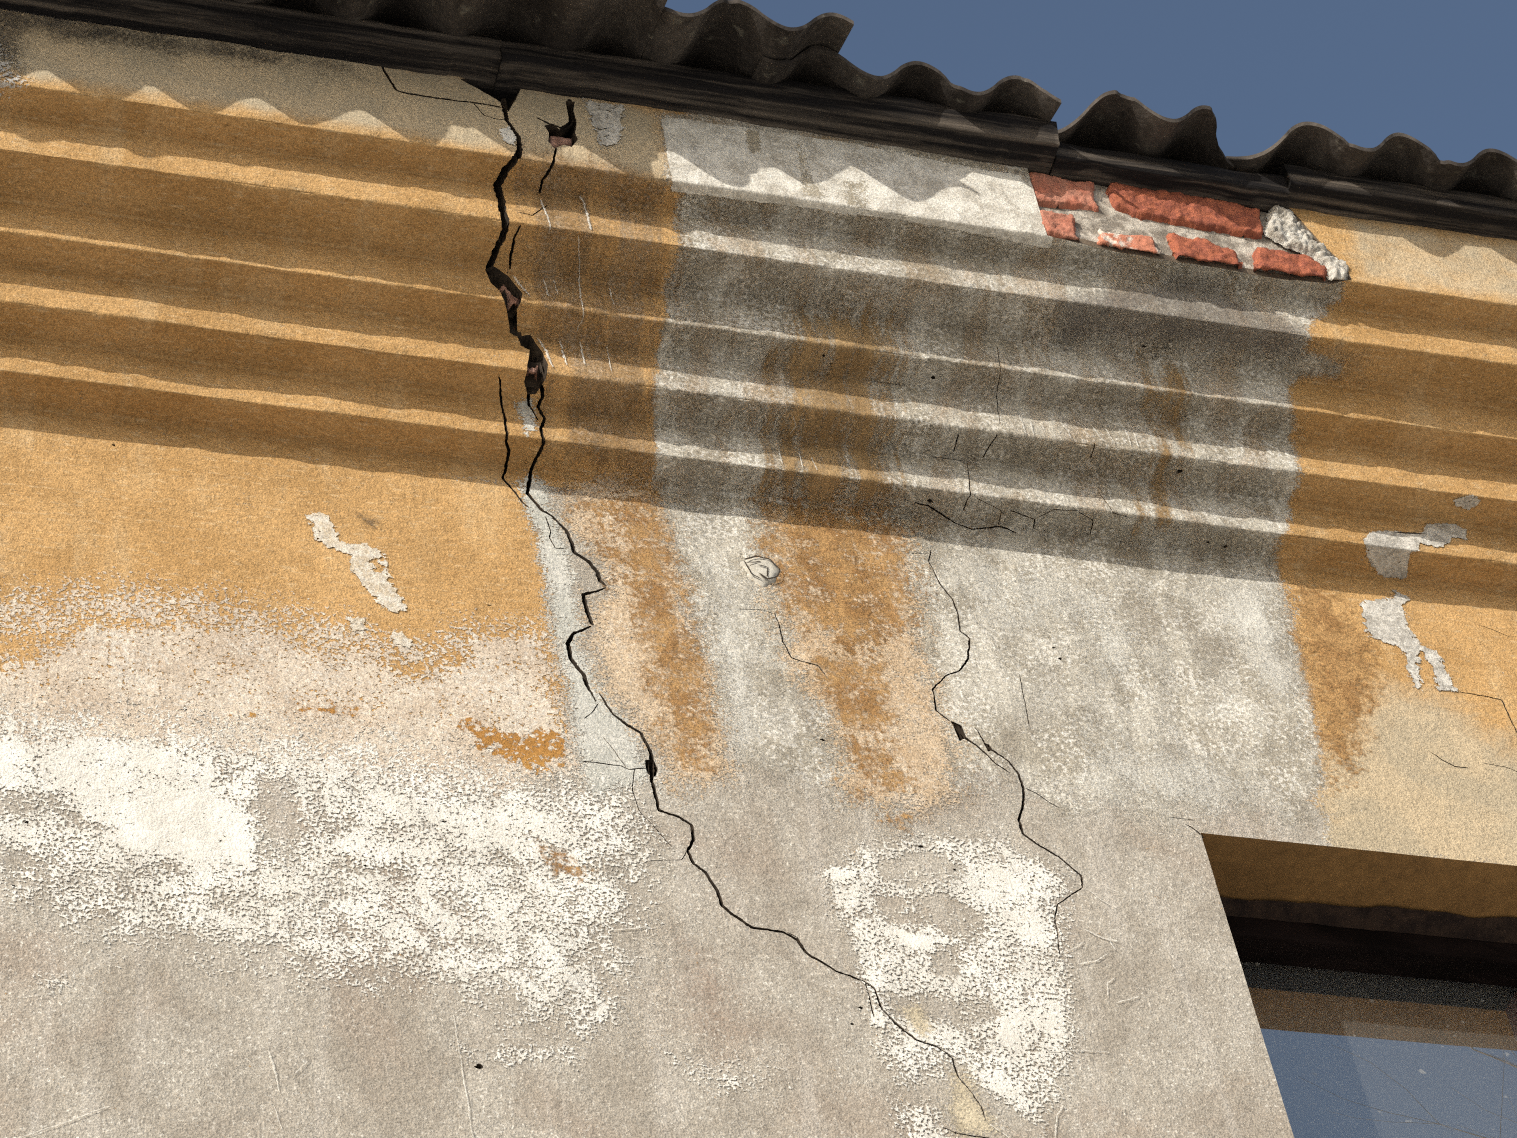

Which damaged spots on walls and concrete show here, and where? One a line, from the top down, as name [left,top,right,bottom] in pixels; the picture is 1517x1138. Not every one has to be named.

peeling [582,97,626,148]
peeling [661,118,1351,284]
crack [915,347,1127,534]
peeling [0,512,587,806]
damp [0,472,799,1100]
crack [383,69,1009,1138]
damp [514,113,1345,1138]
crack [911,551,1139,1003]
peeling [1359,494,1480,692]
crack [1046,1034,1110,1138]